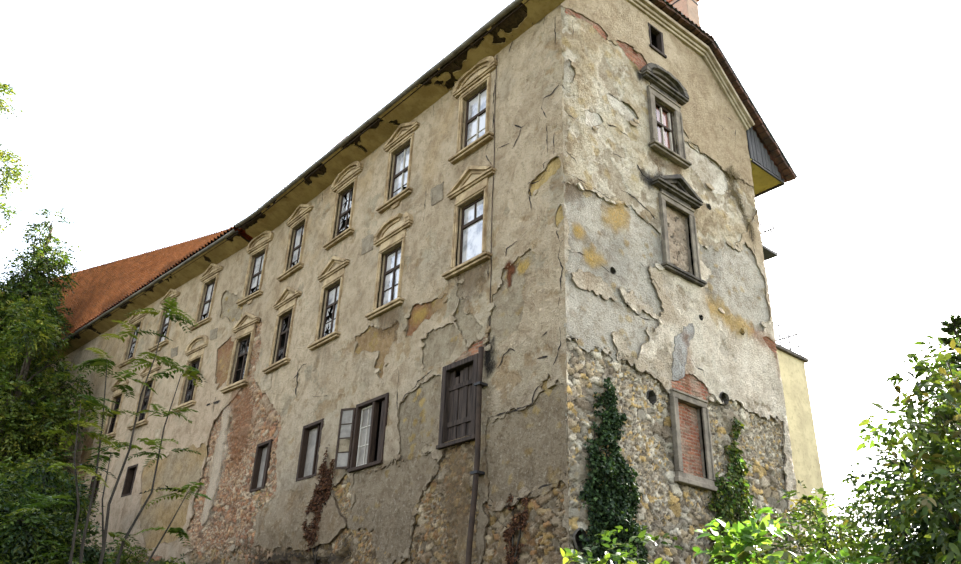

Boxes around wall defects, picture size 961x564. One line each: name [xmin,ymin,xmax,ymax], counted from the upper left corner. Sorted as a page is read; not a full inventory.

crack [486,85,523,165]
crack [528,83,655,219]
peeling [529,7,777,363]
flaking render [130,320,292,564]
crack [489,231,649,418]
flaking render [671,374,711,403]